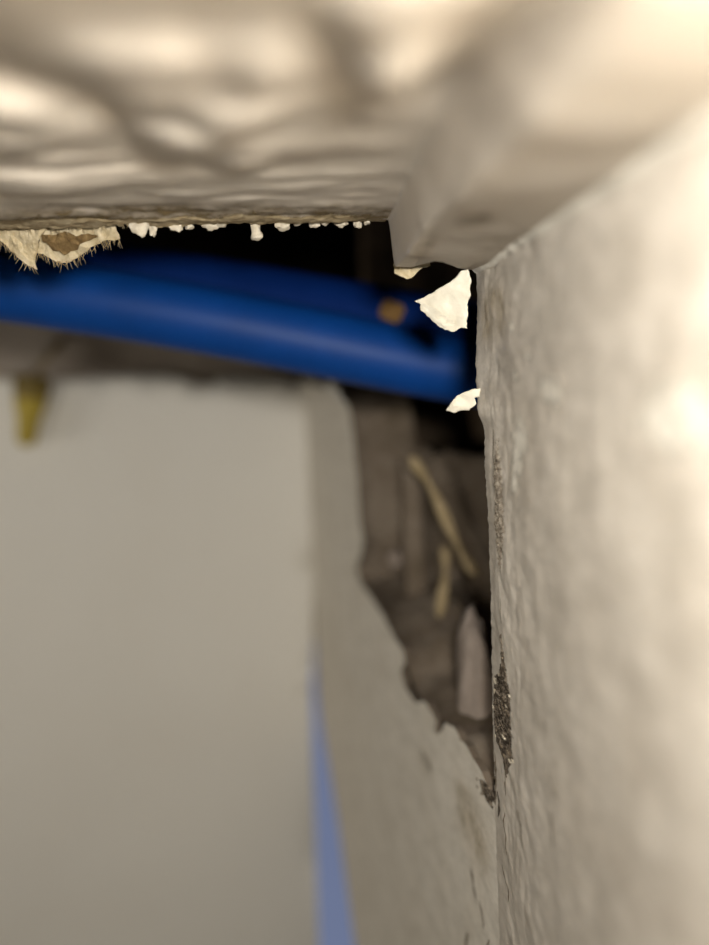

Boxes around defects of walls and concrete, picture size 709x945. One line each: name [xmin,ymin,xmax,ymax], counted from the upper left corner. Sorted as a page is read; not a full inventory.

flaking render [128,222,227,238]
flaking render [274,221,370,232]
peeling [415,270,471,332]
flaking render [311,378,514,796]